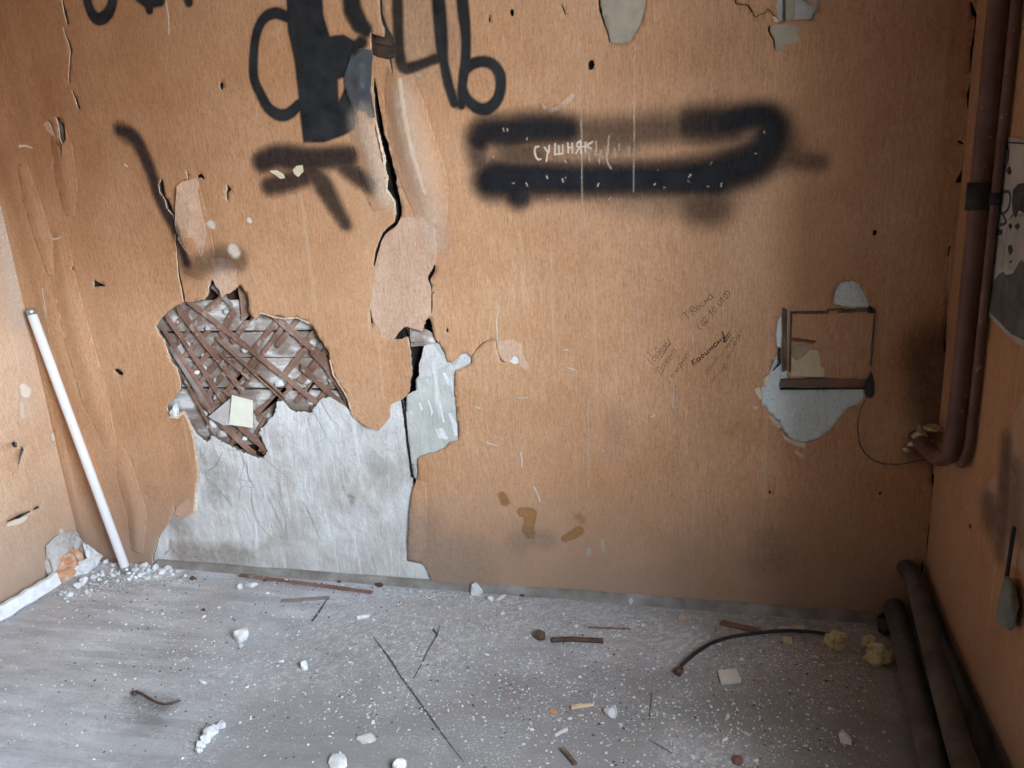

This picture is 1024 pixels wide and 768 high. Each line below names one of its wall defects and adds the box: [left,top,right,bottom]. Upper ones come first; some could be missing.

peeling [599,0,647,44]
spalling [735,0,821,51]
crack [371,0,402,266]
peeling [154,48,473,579]
crack [394,265,437,477]
peeling [753,316,863,460]
peeling [833,281,869,308]
spalling [45,532,103,583]